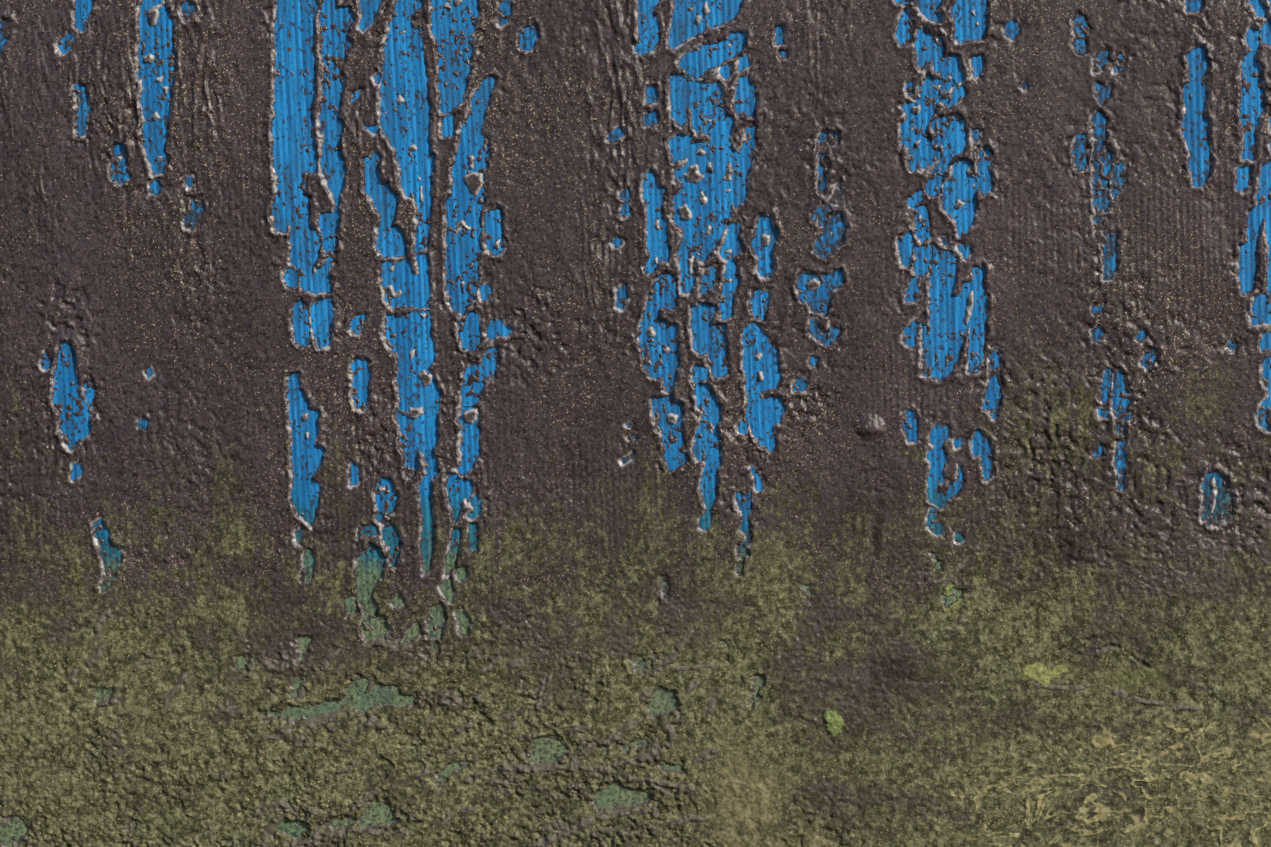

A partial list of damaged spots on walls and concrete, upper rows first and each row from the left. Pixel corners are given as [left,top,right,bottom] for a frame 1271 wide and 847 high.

peeling [40,342,95,481]
peeling [137,0,195,195]
peeling [287,373,325,582]
peeling [272,0,381,348]
peeling [344,0,513,657]
peeling [620,0,807,529]
peeling [903,410,992,542]
peeling [896,0,1002,420]
peeling [1181,47,1211,187]
peeling [1236,0,1271,431]
water stain [710,729,831,847]
water stain [944,713,1271,847]